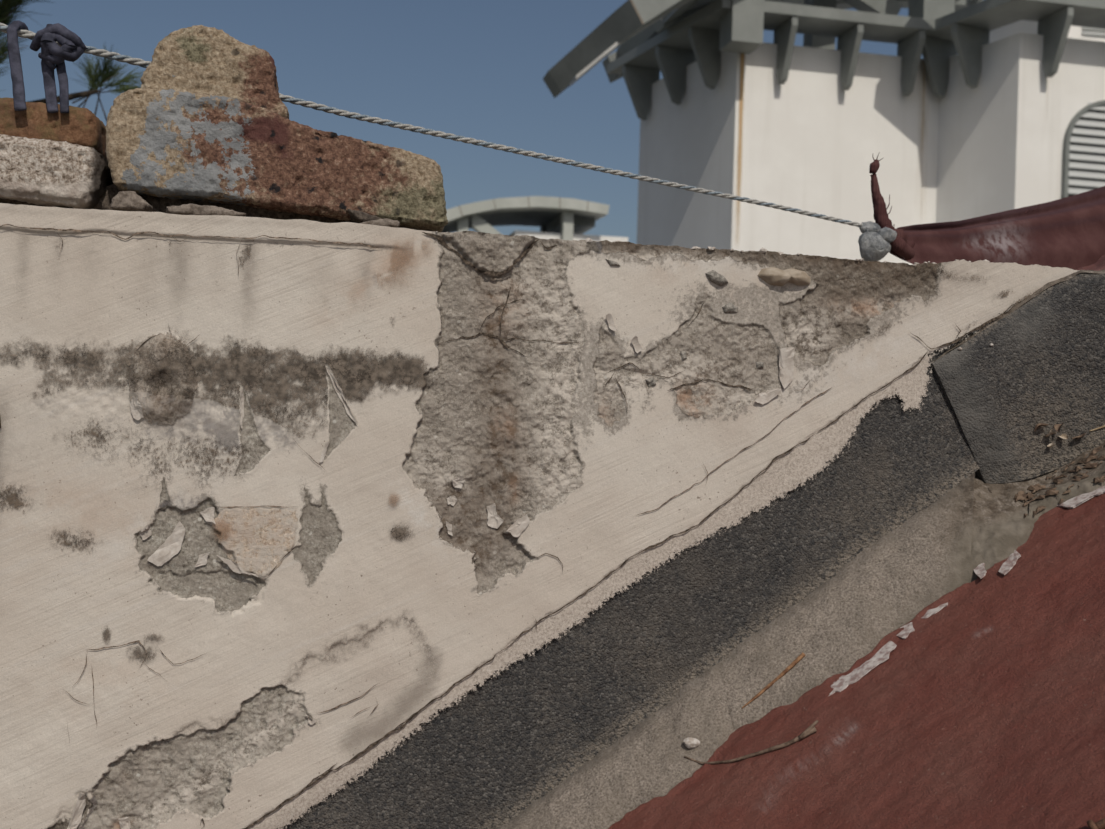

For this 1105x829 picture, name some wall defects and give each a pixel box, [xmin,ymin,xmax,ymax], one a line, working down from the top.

crack [422,232,574,357]
damp [0,336,430,437]
spalling [402,231,943,594]
spalling [134,477,342,612]
crack [243,300,1024,829]
crack [63,640,201,741]
spalling [48,685,316,829]